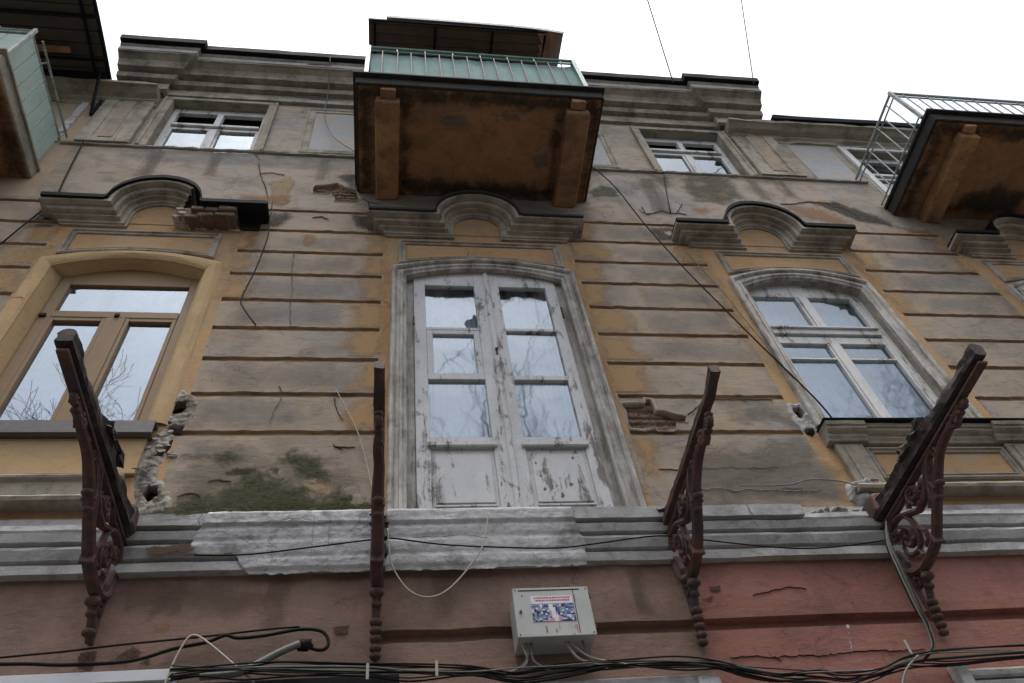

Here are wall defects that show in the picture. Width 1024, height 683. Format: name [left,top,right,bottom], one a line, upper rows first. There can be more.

crack [254,153,283,196]
flaking render [311,183,362,203]
flaking render [172,205,261,233]
spalling [787,403,815,437]
flaking render [133,390,198,514]
flaking render [619,397,689,493]